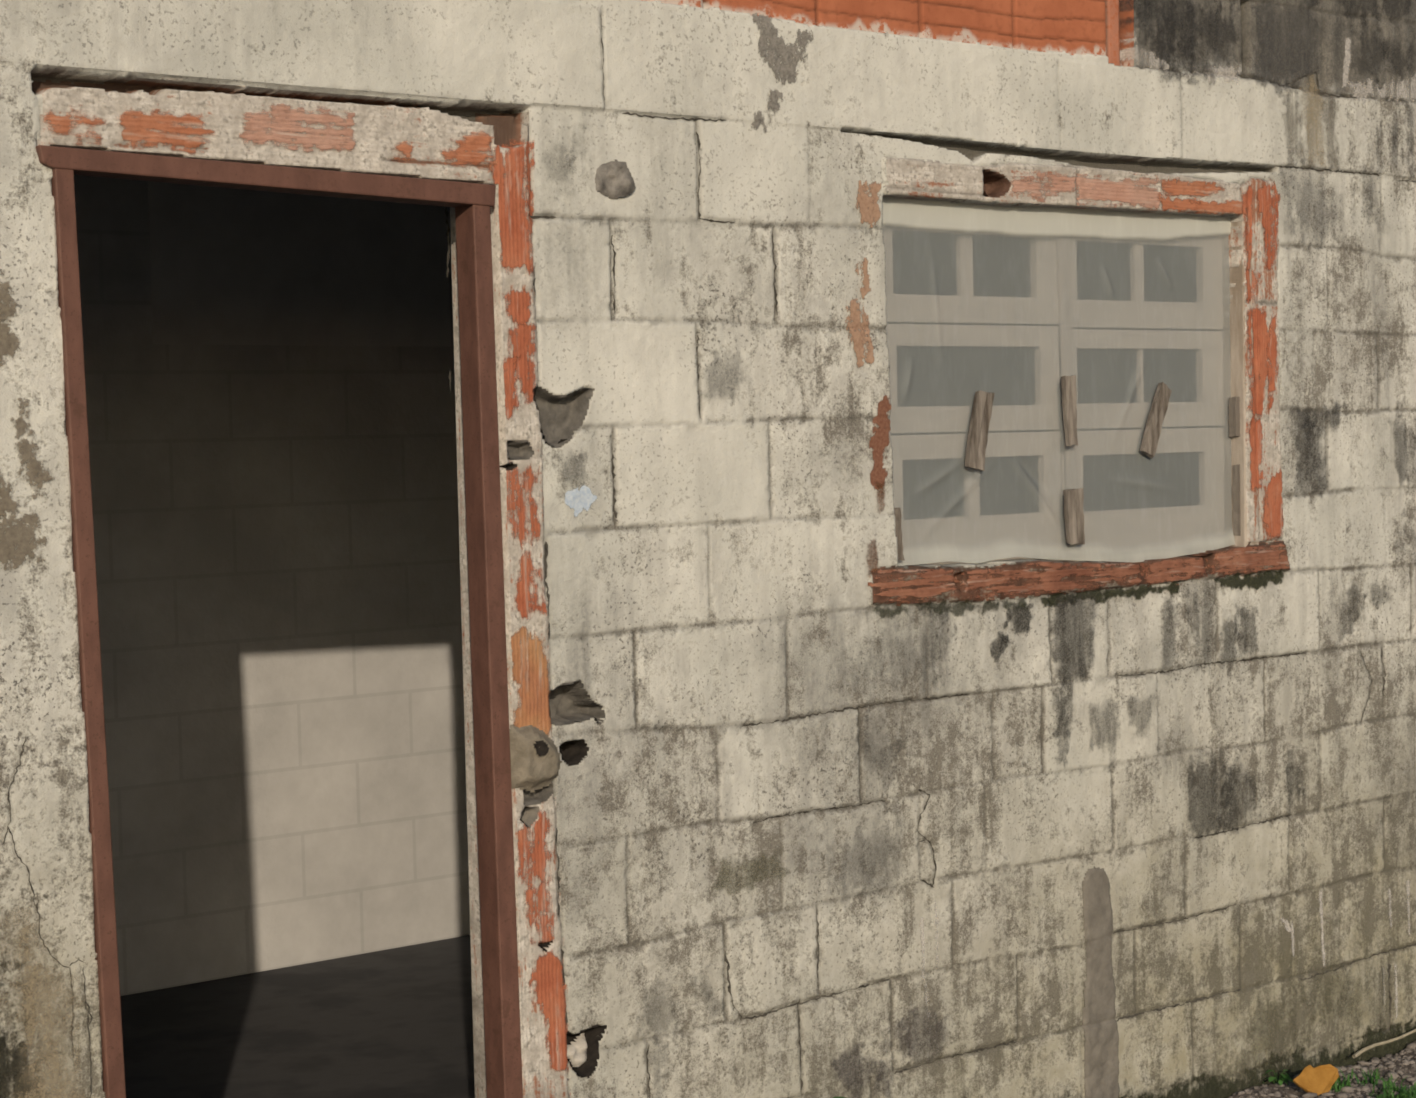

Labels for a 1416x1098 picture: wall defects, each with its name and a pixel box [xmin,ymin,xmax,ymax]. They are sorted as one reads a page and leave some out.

flaking render [43,109,214,153]
flaking render [239,104,355,152]
water stain [1119,0,1338,168]
water stain [1341,0,1416,153]
flaking render [442,131,606,766]
flaking render [868,169,1290,606]
water stain [1296,404,1340,490]
crack [753,800,886,823]
crack [918,789,937,888]
water stain [1188,755,1255,838]
crack [3,737,92,1097]
flaking render [518,781,607,1079]